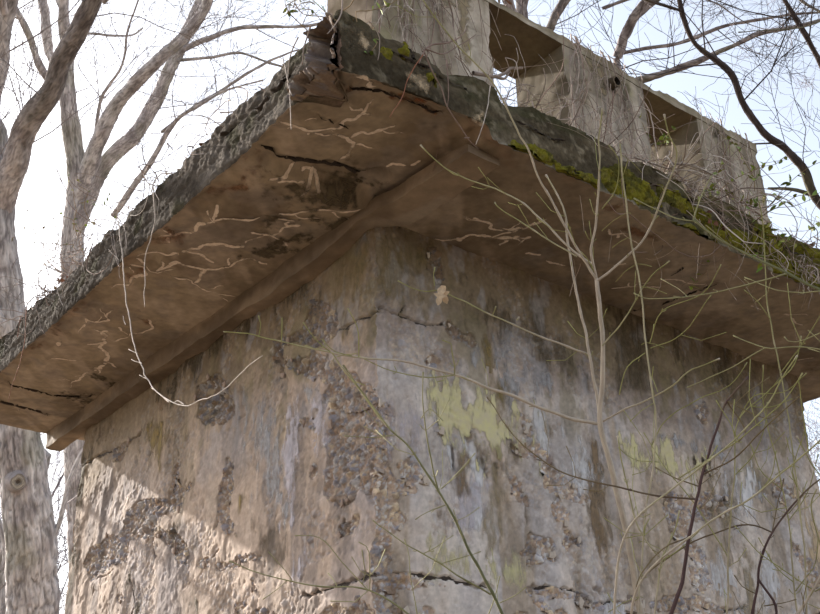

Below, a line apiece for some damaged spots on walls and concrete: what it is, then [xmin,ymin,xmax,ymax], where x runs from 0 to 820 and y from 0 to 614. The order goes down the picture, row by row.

spalling [286,13,345,102]
crack [261,145,366,173]
crack [0,381,96,416]
spalling [193,373,236,425]
spalling [272,299,446,614]
spalling [508,412,591,566]
spalling [83,457,262,581]
spalling [234,601,277,614]
crack [306,573,486,596]
crack [534,586,611,605]